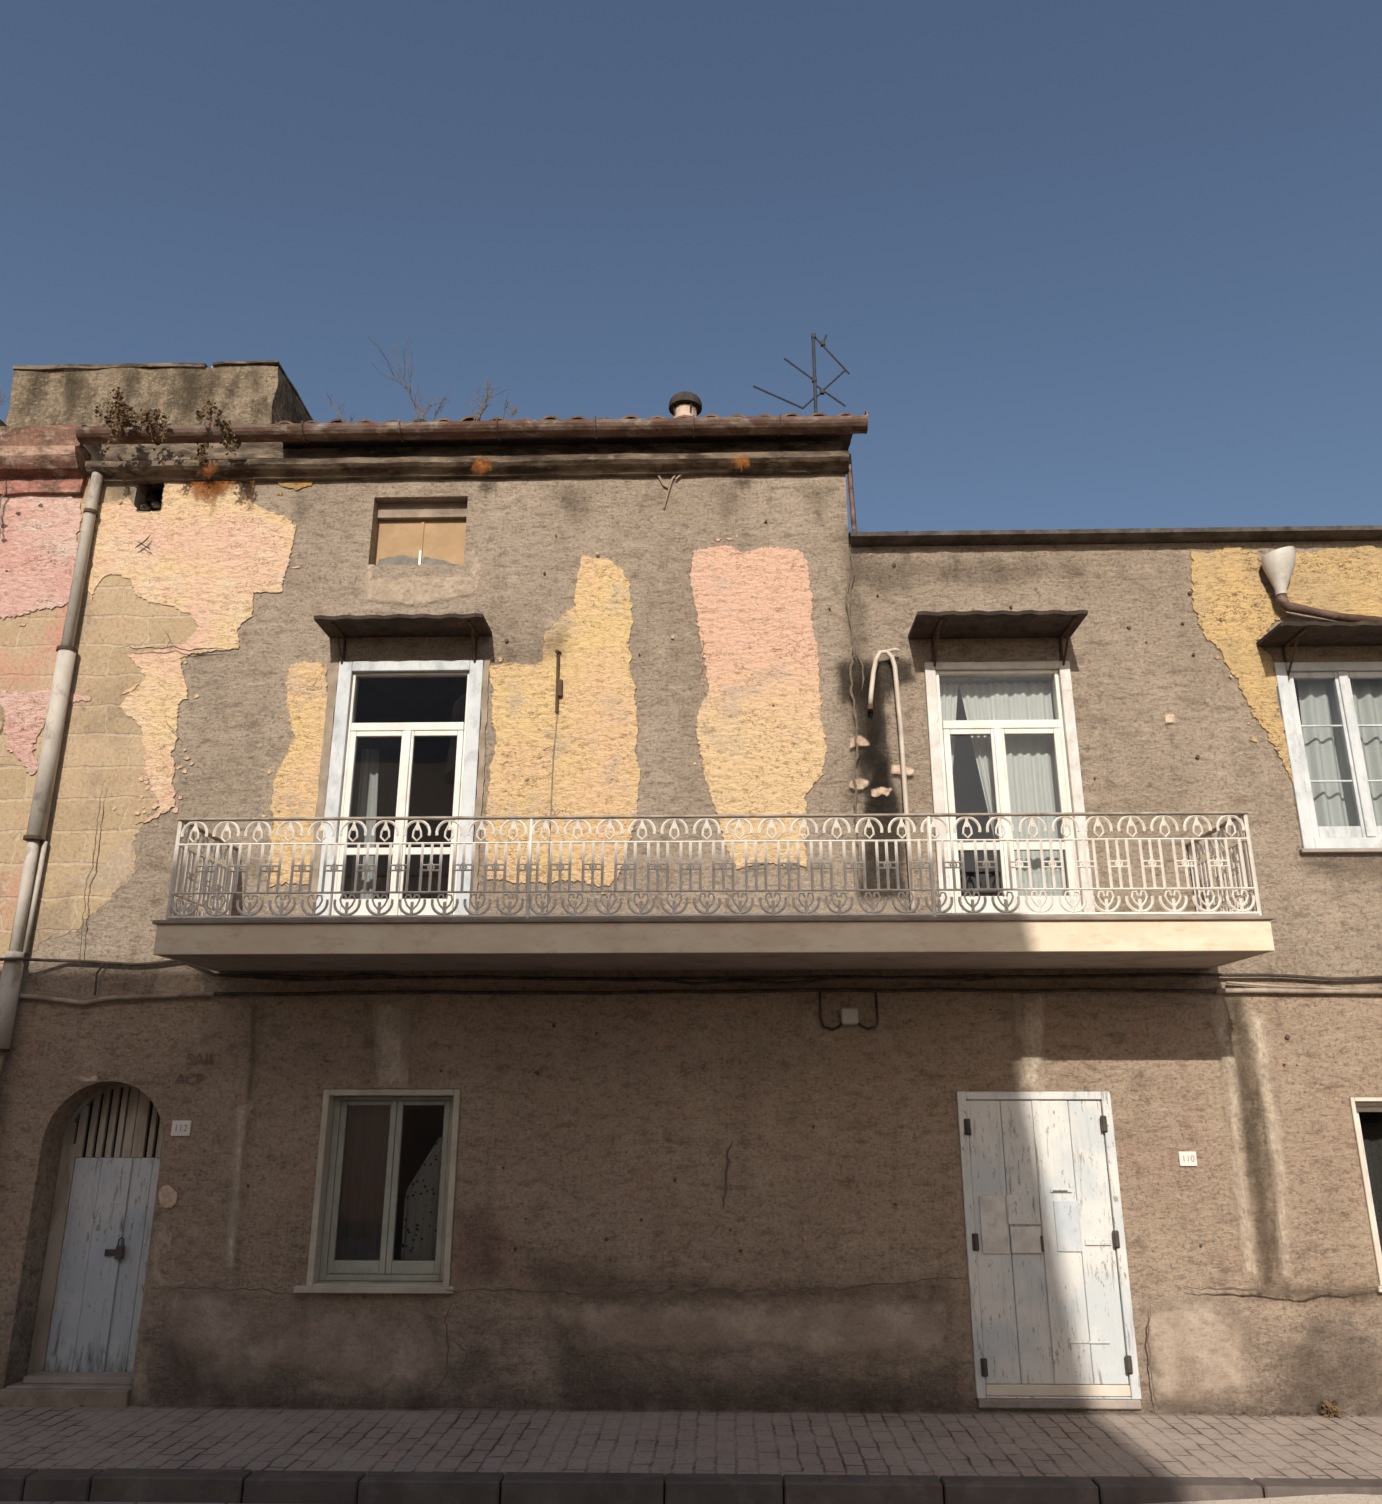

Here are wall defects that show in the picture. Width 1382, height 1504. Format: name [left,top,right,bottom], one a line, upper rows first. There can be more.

flaking render [0,481,314,958]
peeling [262,661,330,888]
peeling [485,552,649,894]
peeling [689,535,831,870]
water stain [839,659,912,897]
peeling [1181,542,1382,784]
crack [420,1277,960,1396]